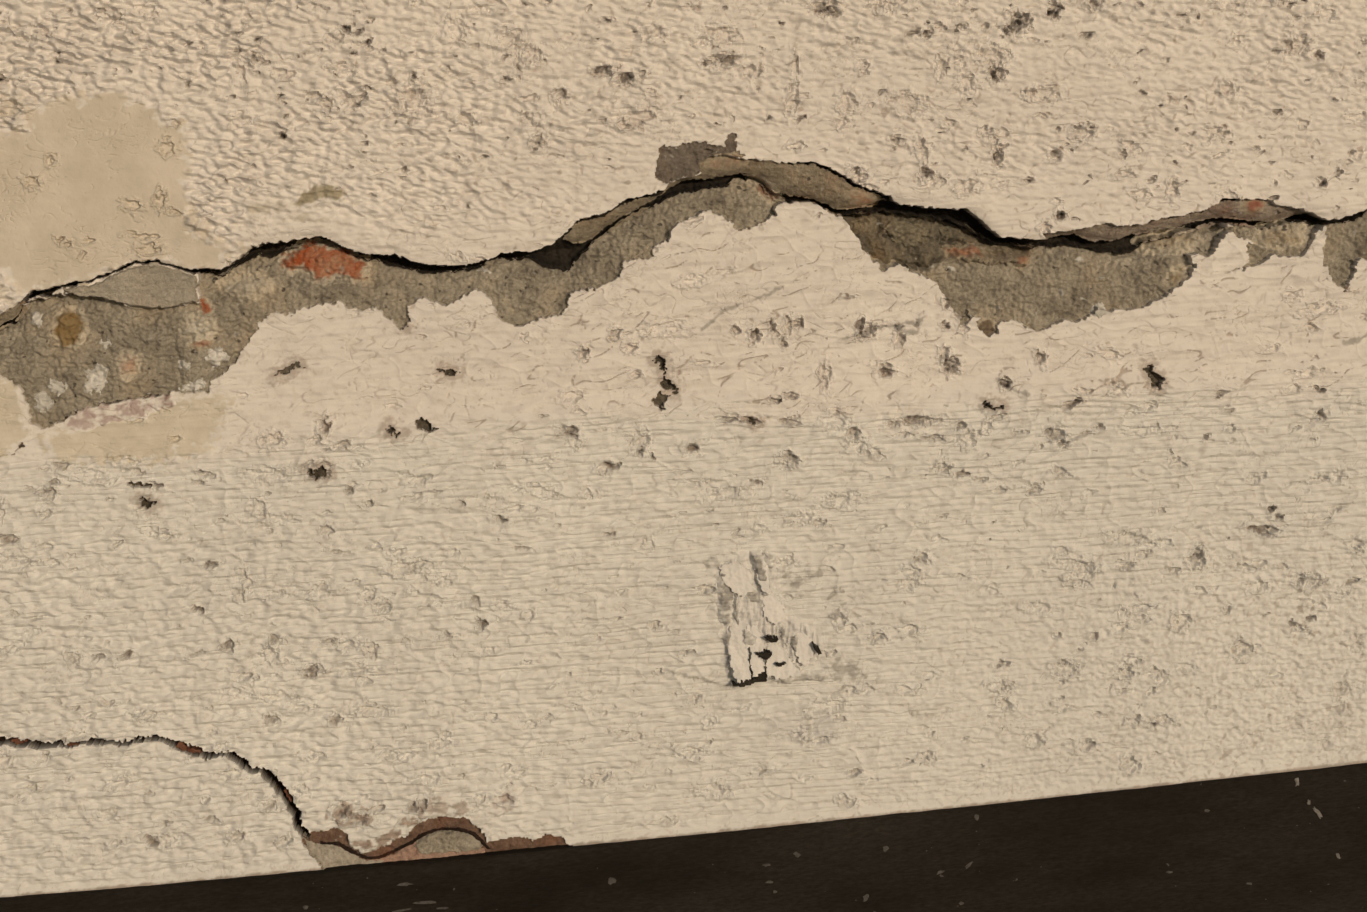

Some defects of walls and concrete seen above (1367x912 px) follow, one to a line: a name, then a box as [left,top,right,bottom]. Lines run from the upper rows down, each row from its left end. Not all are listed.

crack [0,151,1367,334]
spalling [841,205,1367,336]
spalling [0,133,775,509]
crack [837,312,929,343]
crack [993,374,1032,399]
spalling [1143,364,1163,387]
crack [1340,331,1367,347]
crack [0,734,311,836]
spalling [302,784,568,870]